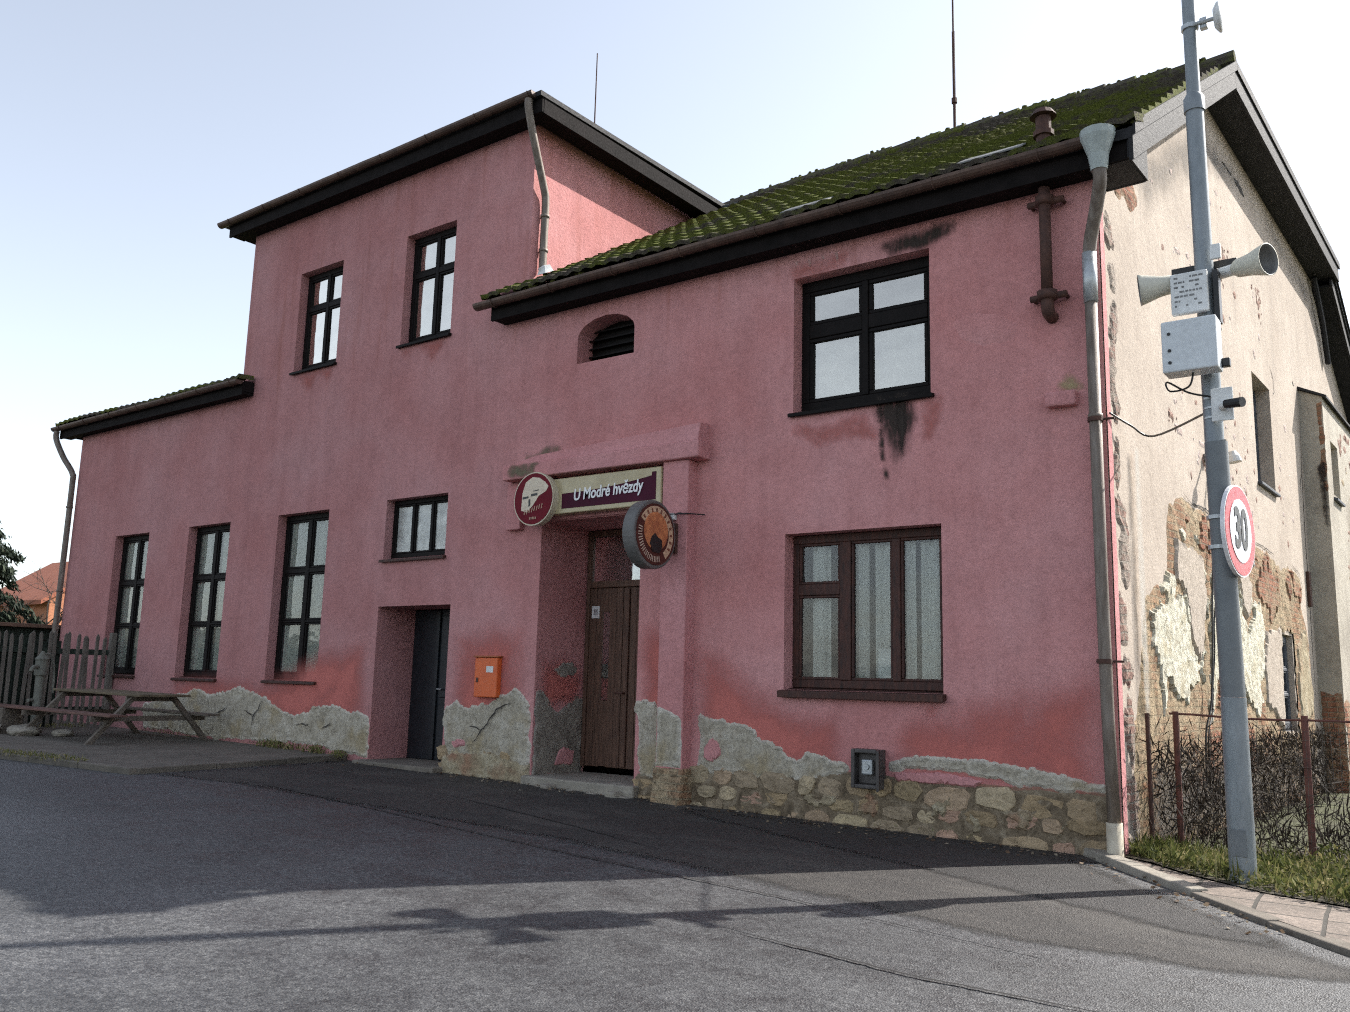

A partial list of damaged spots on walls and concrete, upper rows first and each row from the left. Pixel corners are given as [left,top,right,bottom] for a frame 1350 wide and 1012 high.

water stain [822,394,913,477]
flaking render [1103,210,1226,860]
flaking render [142,685,370,758]
flaking render [442,687,583,775]
flaking render [634,699,682,778]
flaking render [697,713,850,781]
flaking render [888,755,1106,794]
flaking render [1237,547,1350,816]